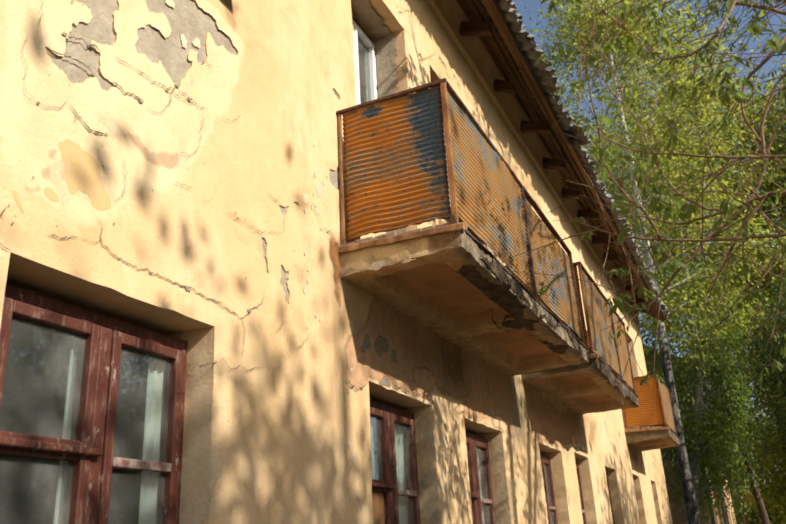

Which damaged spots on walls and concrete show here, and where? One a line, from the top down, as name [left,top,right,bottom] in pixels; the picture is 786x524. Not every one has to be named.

crack [22,0,109,135]
peeling [46,0,118,91]
crack [113,57,210,157]
peeling [135,0,239,85]
crack [52,220,265,371]
peeling [280,266,289,301]
water stain [419,419,444,524]